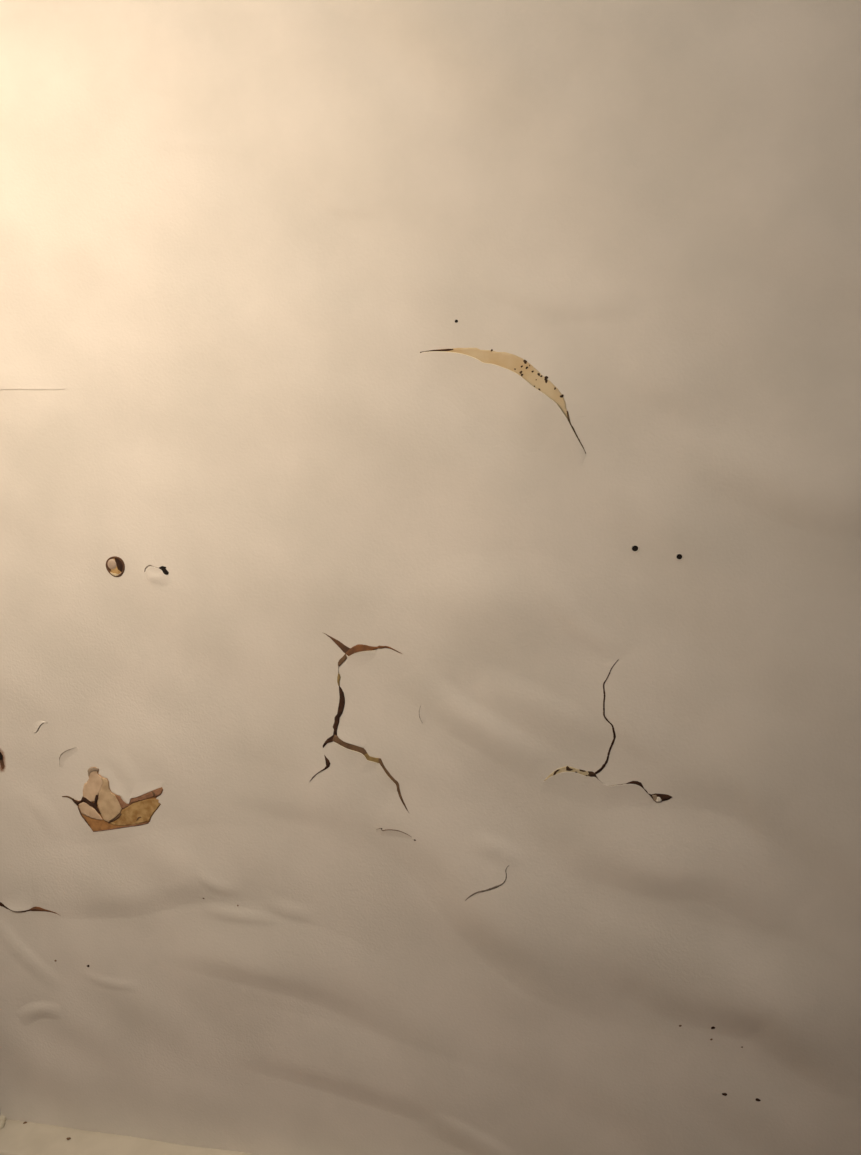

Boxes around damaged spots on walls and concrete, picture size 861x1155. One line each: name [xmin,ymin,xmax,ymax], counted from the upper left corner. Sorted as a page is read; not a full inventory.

crack [310,633,416,841]
crack [541,659,672,811]
peeling [62,767,164,832]
crack [0,890,61,916]
crack [465,866,508,901]